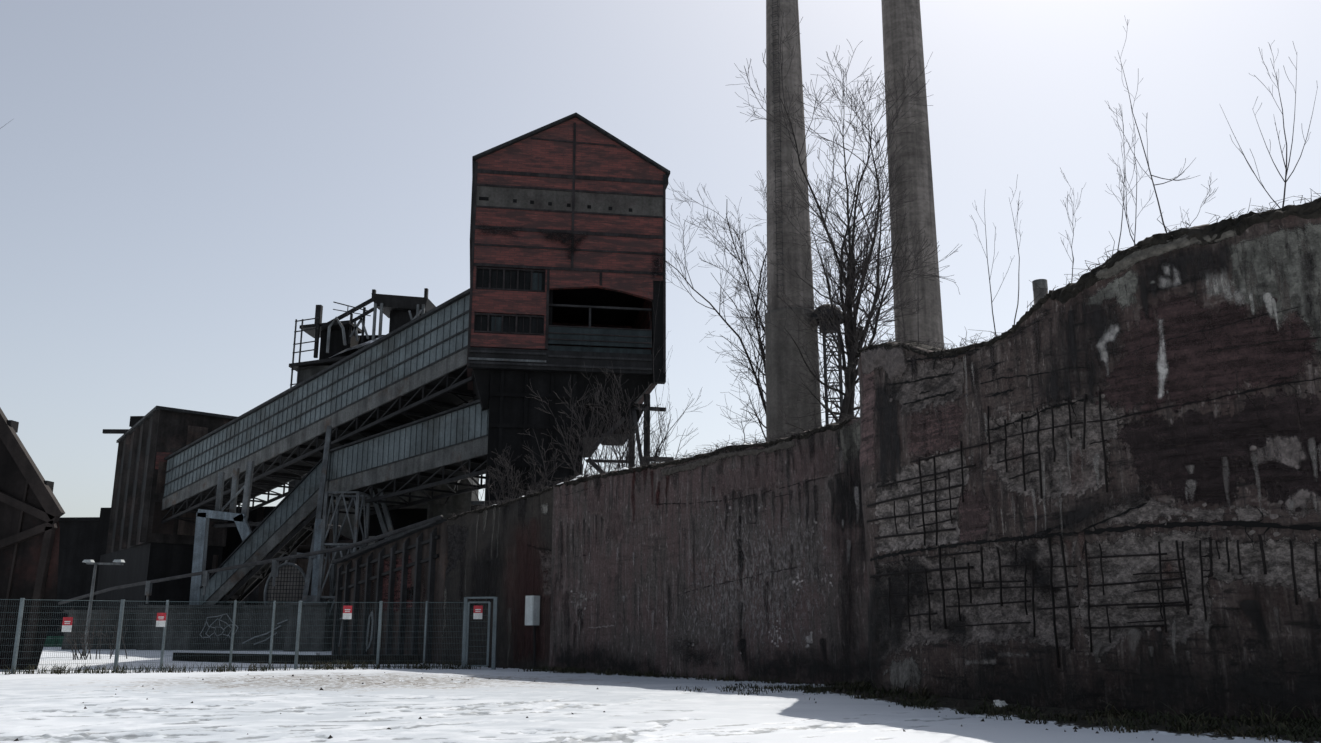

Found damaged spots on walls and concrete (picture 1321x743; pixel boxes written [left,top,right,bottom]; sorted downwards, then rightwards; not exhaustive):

damp [1033,302,1119,405]
damp [1138,243,1278,398]
spalling [859,223,1321,691]
damp [702,489,783,582]
damp [737,428,926,688]